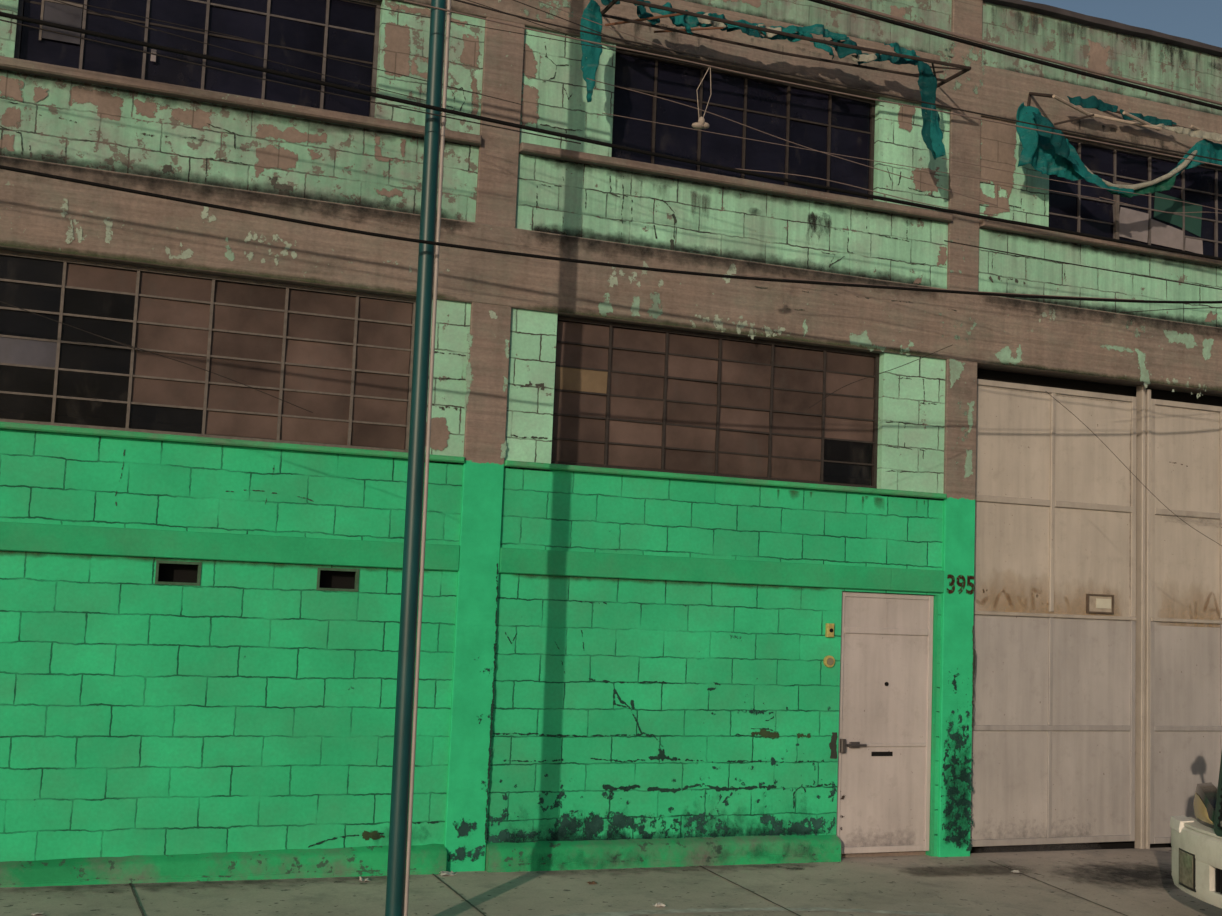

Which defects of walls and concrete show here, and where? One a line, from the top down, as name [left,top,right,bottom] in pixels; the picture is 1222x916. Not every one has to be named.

peeling [383,4,431,79]
peeling [450,18,480,115]
peeling [0,76,49,158]
peeling [59,86,212,141]
peeling [251,124,327,191]
peeling [598,261,664,319]
peeling [690,314,808,339]
peeling [425,327,473,451]
spalling [447,732,845,863]
crack [484,563,831,843]
spalling [737,702,788,739]
spalling [941,668,974,852]